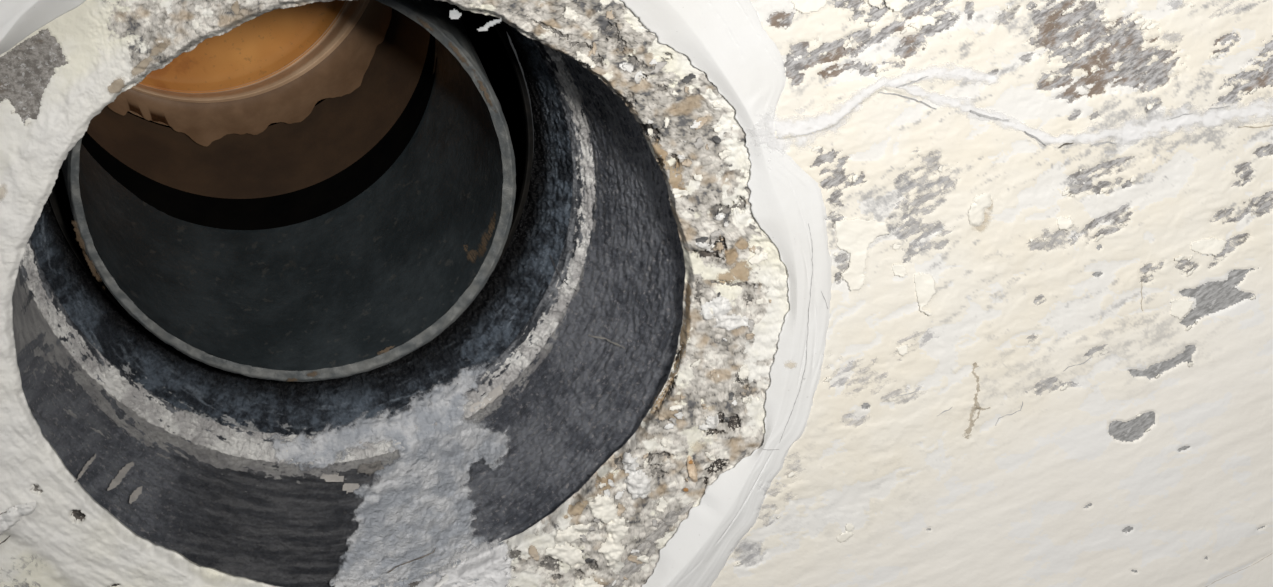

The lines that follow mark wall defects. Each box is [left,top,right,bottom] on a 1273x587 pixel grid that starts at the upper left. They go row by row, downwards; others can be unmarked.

peeling [0,28,68,126]
peeling [784,0,974,86]
crack [751,64,1273,150]
peeling [996,0,1180,121]
water stain [653,143,686,197]
water stain [719,238,751,283]
peeling [810,146,954,316]
peeling [1128,191,1273,380]
water stain [650,284,691,413]
peeling [1108,411,1155,442]
water stain [564,501,588,519]
water stain [595,473,614,491]